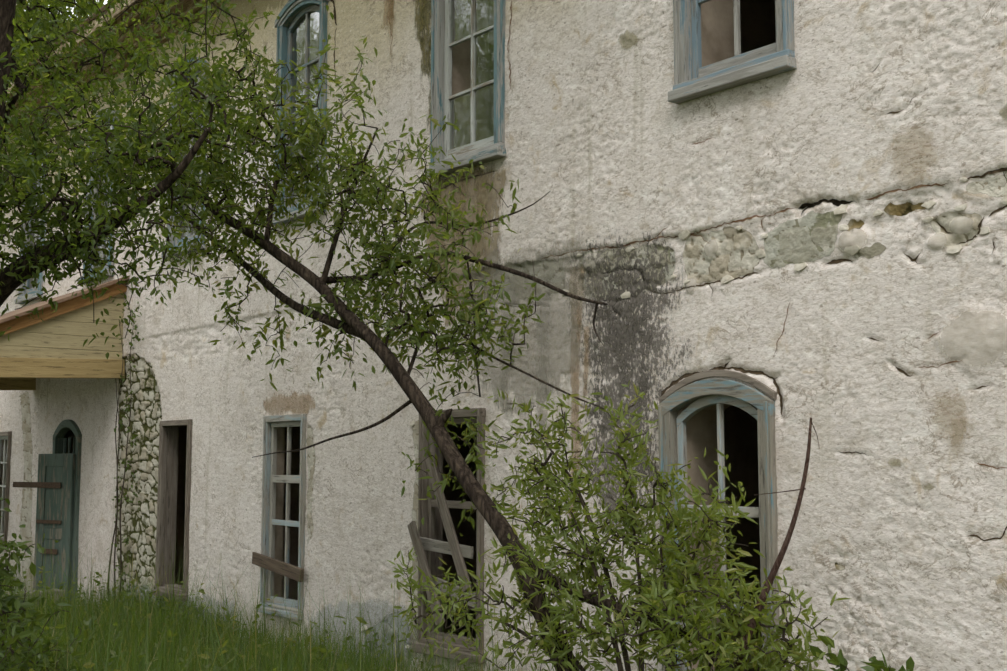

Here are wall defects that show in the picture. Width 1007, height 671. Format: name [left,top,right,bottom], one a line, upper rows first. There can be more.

water stain [415,0,431,151]
spalling [482,172,1007,301]
crack [541,168,1007,314]
water stain [567,231,692,534]